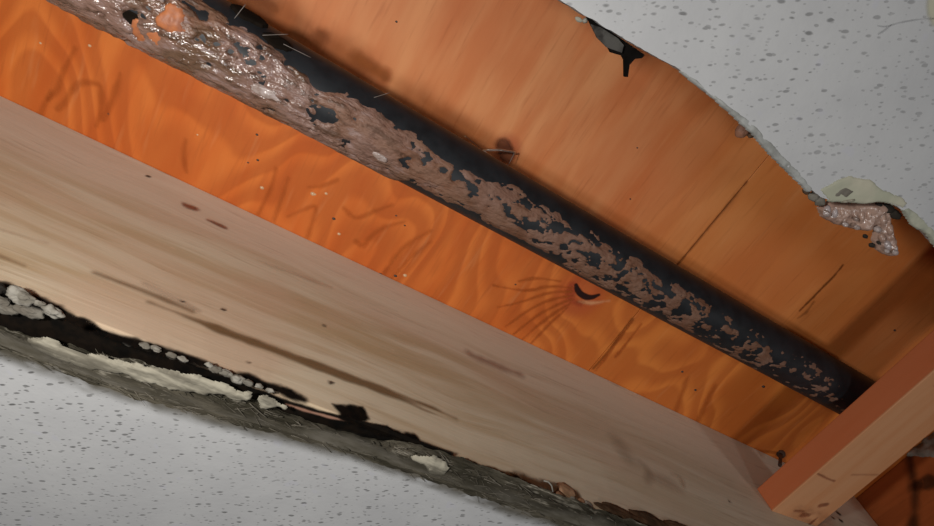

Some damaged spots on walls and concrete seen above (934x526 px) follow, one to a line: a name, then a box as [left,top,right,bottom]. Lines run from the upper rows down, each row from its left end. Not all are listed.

spalling [821,176,907,208]
peeling [27,337,288,410]
water stain [0,281,453,456]
water stain [469,460,580,499]